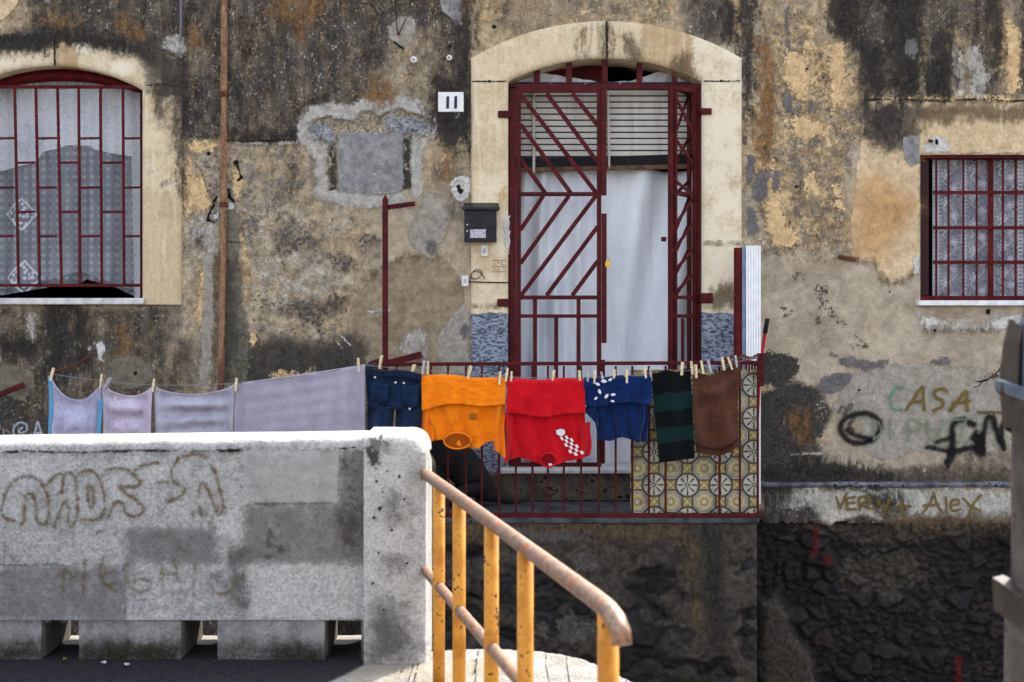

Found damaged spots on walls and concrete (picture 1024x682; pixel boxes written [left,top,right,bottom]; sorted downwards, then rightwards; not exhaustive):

damp [0,25,192,198]
damp [227,126,301,150]
spalling [305,105,438,197]
peeling [744,139,801,250]
peeling [781,5,848,142]
flaking render [803,101,1024,285]
damp [819,0,1024,150]
damp [0,305,94,384]
damp [193,254,220,385]
spalling [929,356,951,366]